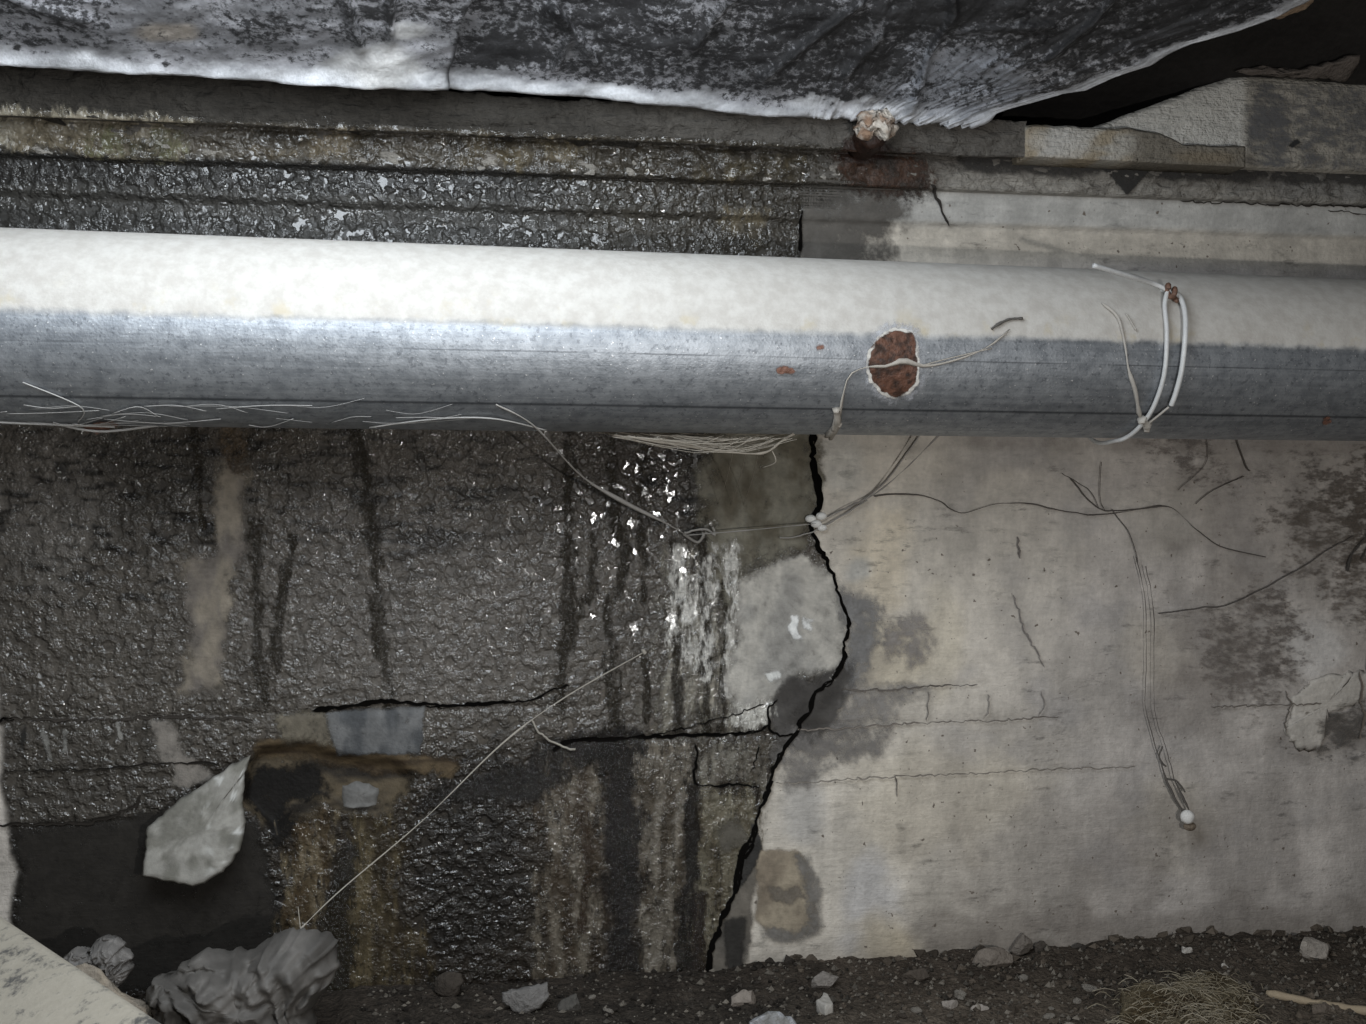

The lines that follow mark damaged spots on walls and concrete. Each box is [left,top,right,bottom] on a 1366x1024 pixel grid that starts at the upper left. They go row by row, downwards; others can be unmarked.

rust [868,330,918,397]
leakage [1259,453,1366,621]
crack [313,684,569,713]
leakage [0,424,930,999]
crack [552,434,1134,972]
leakage [1201,589,1310,705]
spalling [141,737,460,887]